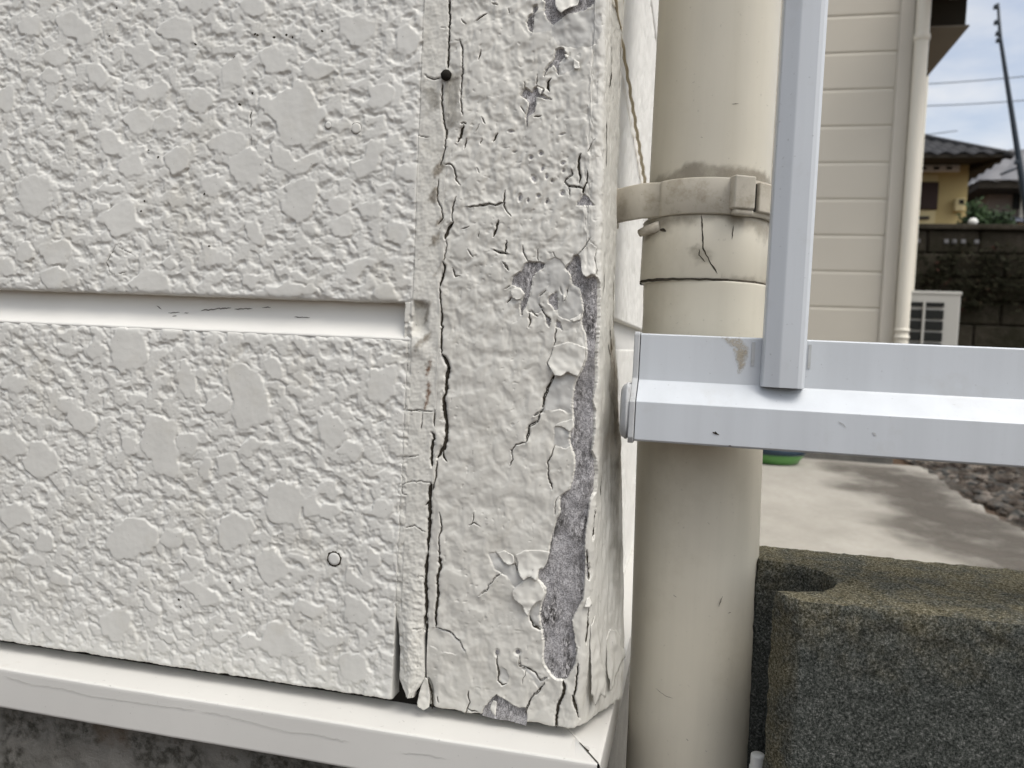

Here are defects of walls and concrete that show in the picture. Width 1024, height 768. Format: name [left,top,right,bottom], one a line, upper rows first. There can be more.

peeling [521,0,602,125]
crack [640,215,766,285]
crack [402,2,511,631]
peeling [465,243,625,726]
crack [428,679,438,709]
crack [555,666,579,727]